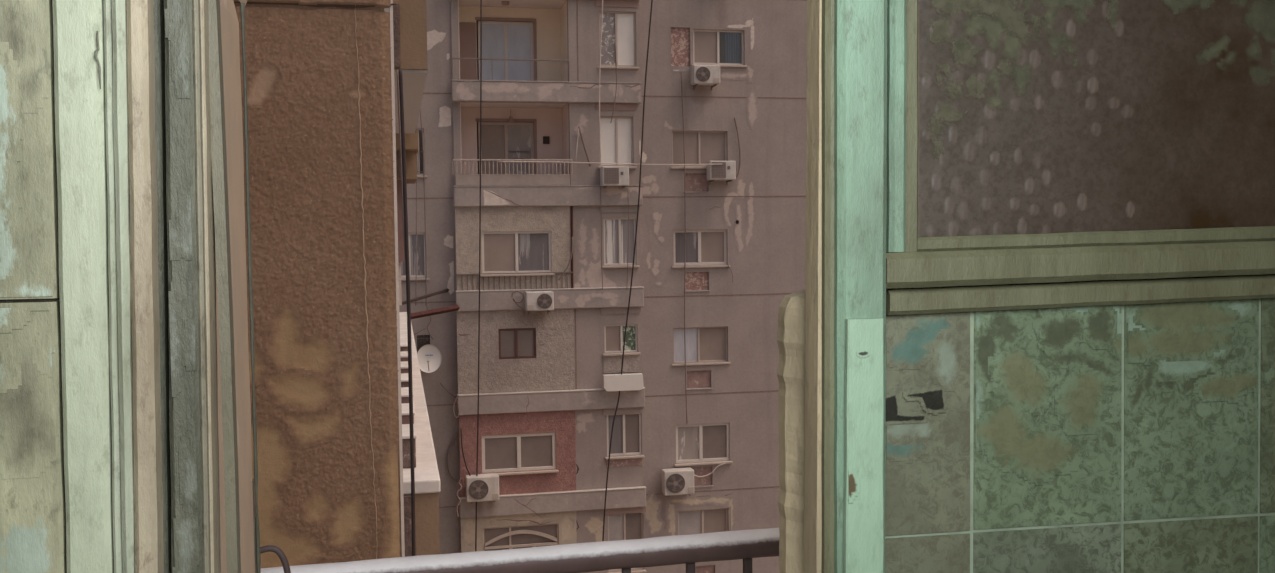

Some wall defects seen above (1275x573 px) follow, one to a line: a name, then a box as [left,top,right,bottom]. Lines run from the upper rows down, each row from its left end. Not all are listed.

peeling [427,28,450,62]
peeling [436,82,641,129]
peeling [575,137,666,287]
peeling [722,178,755,254]
peeling [555,216,620,308]